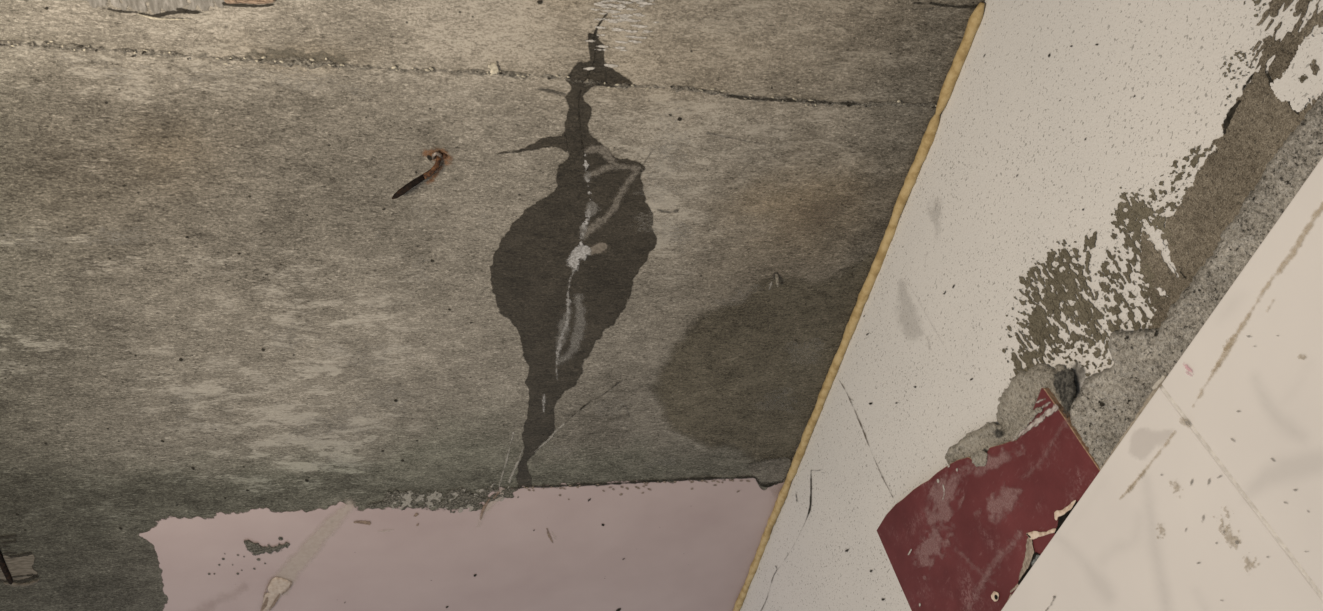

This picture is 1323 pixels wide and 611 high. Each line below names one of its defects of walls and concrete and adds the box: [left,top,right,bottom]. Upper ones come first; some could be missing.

crack [913,1,977,9]
water stain [490,13,657,489]
water stain [655,256,875,463]
peeling [1002,0,1323,380]
spalling [877,388,1100,611]